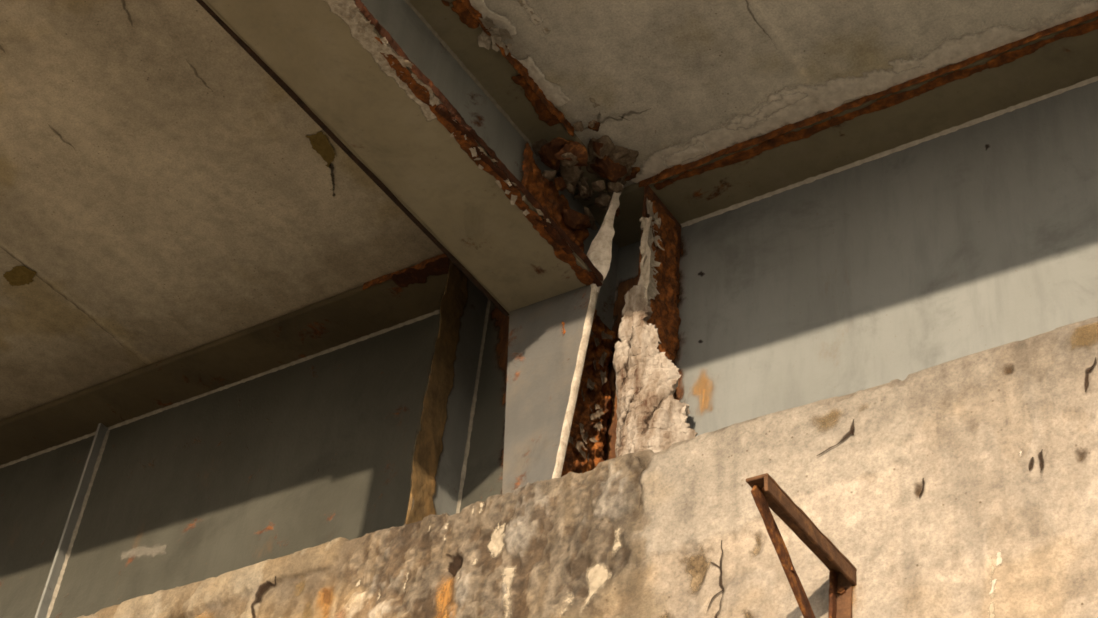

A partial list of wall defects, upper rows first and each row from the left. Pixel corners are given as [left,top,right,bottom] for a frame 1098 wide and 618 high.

peeling [323,0,442,121]
corrosion [353,0,603,287]
spalling [532,120,640,293]
corrosion [561,10,1098,477]
corrosion [491,307,509,406]
crack [251,576,276,618]
corrosion [319,588,331,618]
corrosion [436,554,463,618]
peeling [488,524,505,557]
peeling [586,564,609,603]
crack [707,540,724,618]